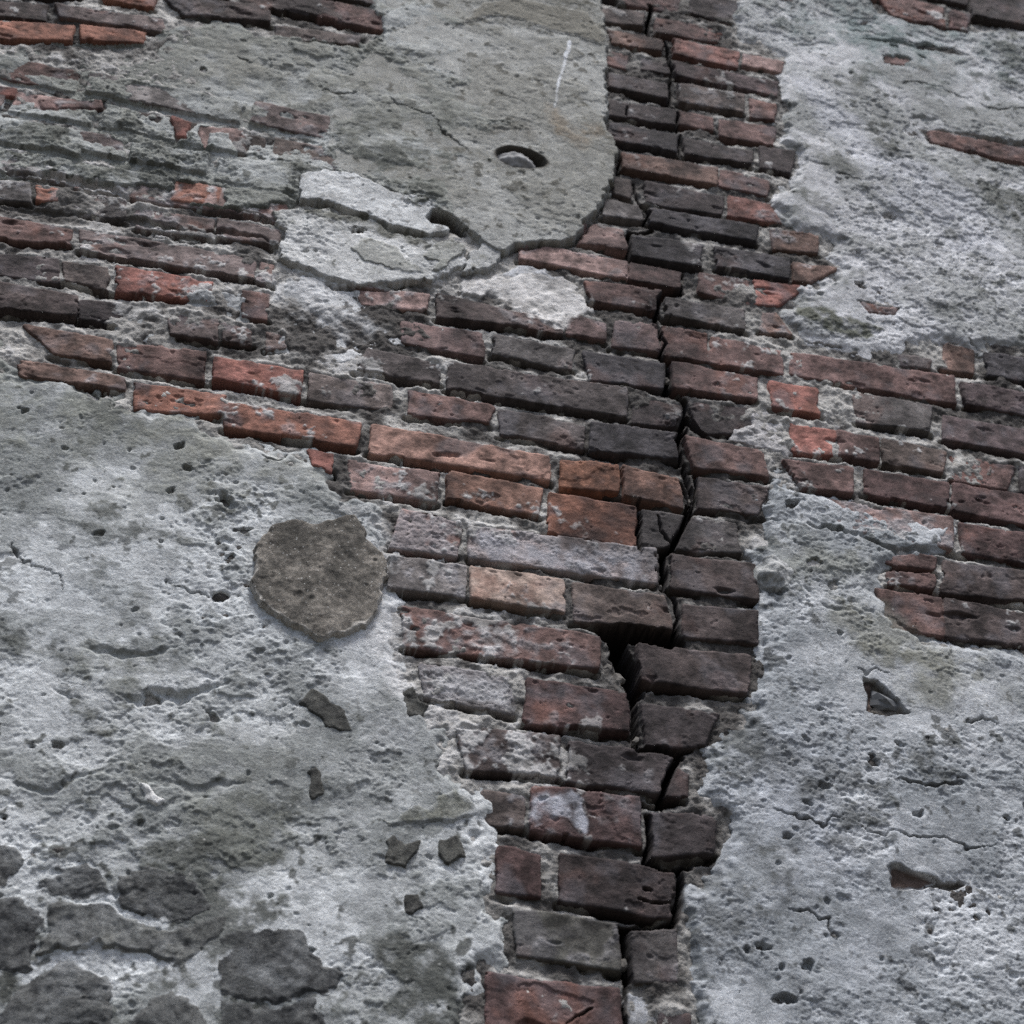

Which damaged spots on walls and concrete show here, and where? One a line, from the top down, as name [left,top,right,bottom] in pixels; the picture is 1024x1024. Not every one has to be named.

crack [642,2,683,161]
crack [389,96,470,152]
peeling [271,169,501,290]
peeling [248,514,388,643]
crack [565,151,712,1024]
spalling [299,688,351,731]
spalling [403,687,429,717]
spalling [307,767,324,800]
spalling [382,789,478,868]
crack [773,807,998,852]
spalling [0,844,353,1024]
spalling [404,894,424,915]